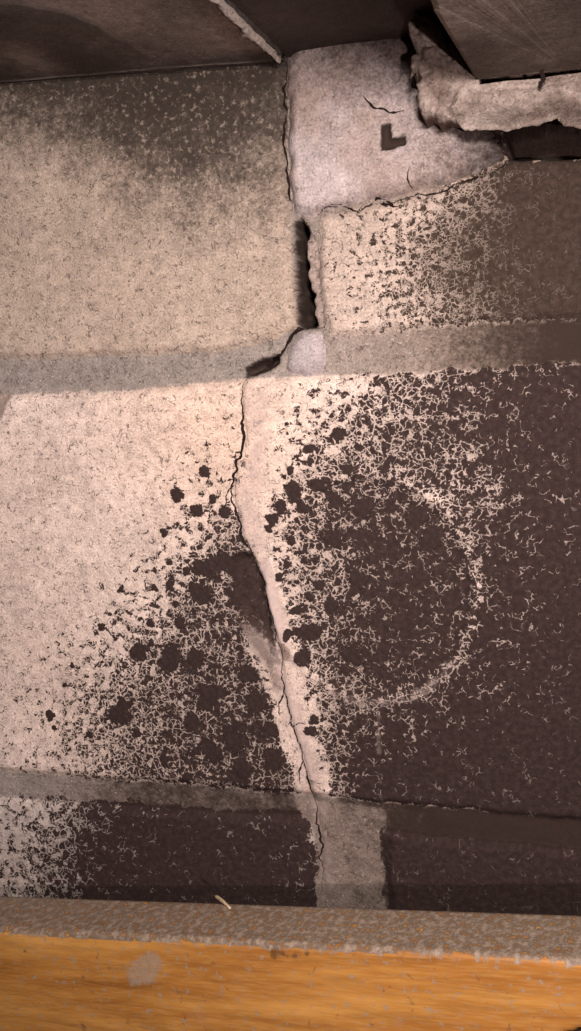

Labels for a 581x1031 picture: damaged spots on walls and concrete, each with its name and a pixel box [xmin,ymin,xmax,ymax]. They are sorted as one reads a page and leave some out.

damp [0,5,196,84]
damp [483,76,509,84]
crack [224,327,325,896]
damp [0,130,581,916]